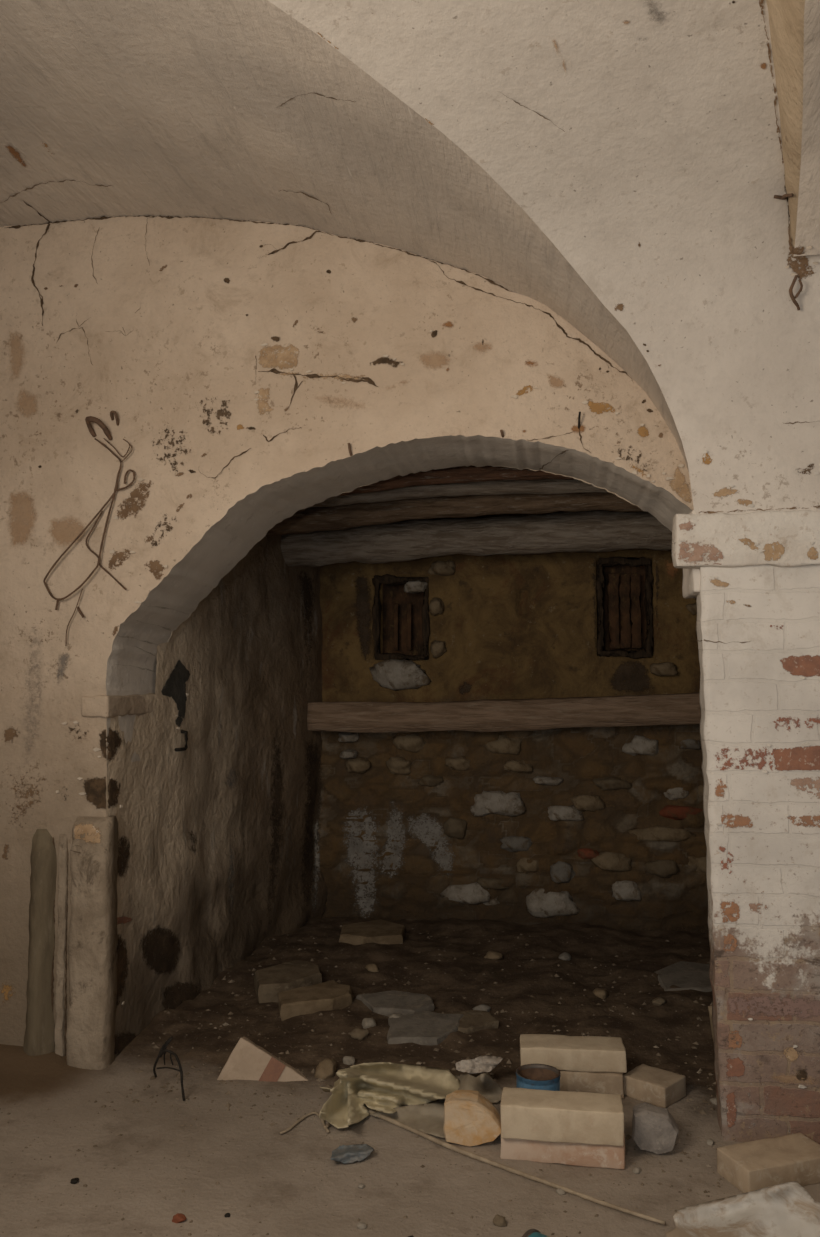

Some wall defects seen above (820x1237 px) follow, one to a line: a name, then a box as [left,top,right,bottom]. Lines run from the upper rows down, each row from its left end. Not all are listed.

crack [1,180,632,379]
flaking render [153,428,207,477]
flaking render [201,388,289,434]
crack [199,356,378,478]
flaking render [615,400,691,503]
peeling [673,521,751,607]
flaking render [161,660,190,730]
peeling [780,655,820,679]
flaking render [56,777,123,809]
peeling [717,814,753,828]
peeling [715,714,820,799]
water stain [140,925,202,1010]